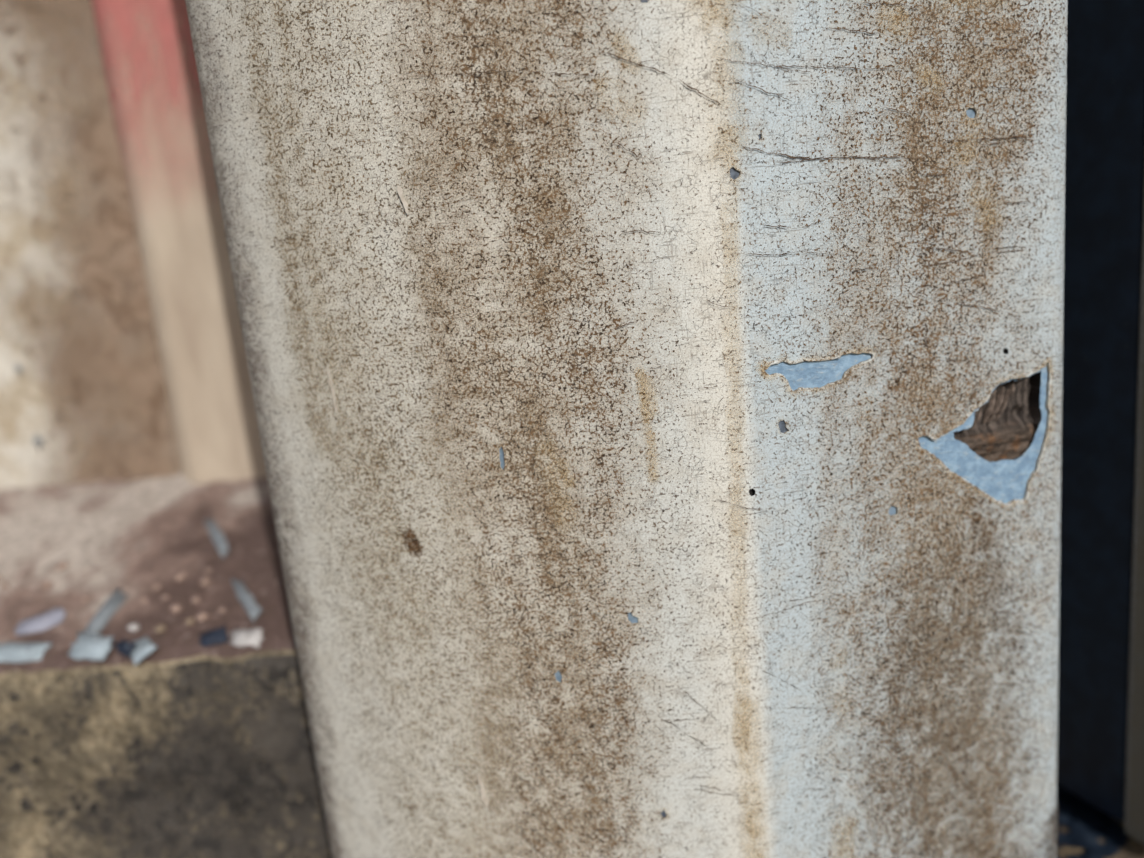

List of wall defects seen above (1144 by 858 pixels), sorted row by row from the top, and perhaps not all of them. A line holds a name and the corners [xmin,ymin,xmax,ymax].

leakage [185,0,685,858]
peeling [761,349,875,394]
leakage [798,0,1065,858]
peeling [915,359,1053,508]